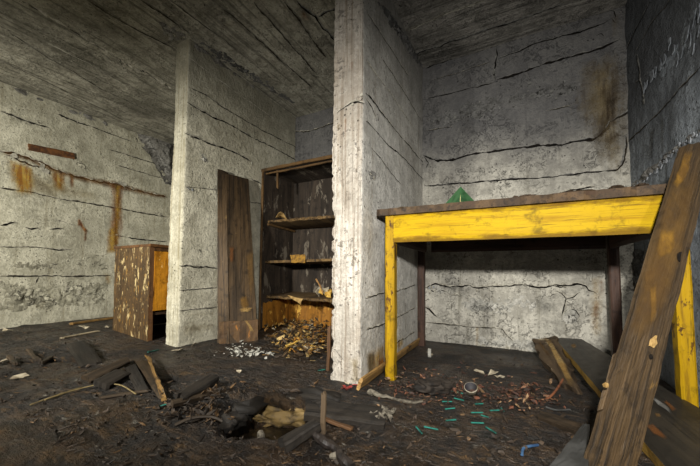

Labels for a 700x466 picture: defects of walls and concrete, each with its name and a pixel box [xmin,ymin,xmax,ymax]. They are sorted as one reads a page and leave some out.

crack [337,2,650,193]
rust [13,143,141,251]
crack [425,282,598,320]